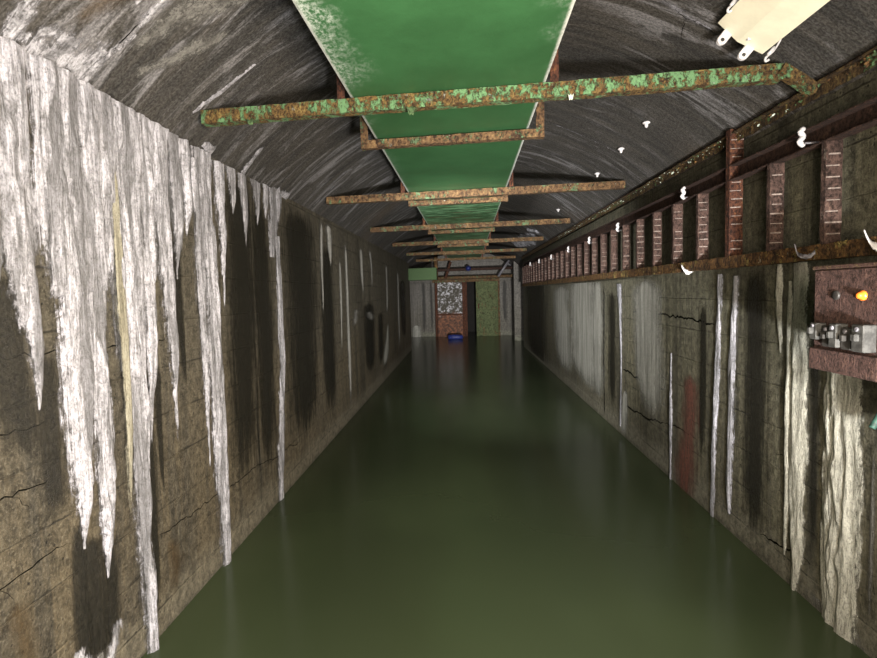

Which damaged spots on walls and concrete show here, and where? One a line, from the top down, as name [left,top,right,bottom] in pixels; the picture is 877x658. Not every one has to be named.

crack [0,482,46,507]
crack [0,544,66,600]
damp [0,0,433,658]
damp [527,282,627,431]
damp [635,281,673,479]
damp [699,262,874,651]